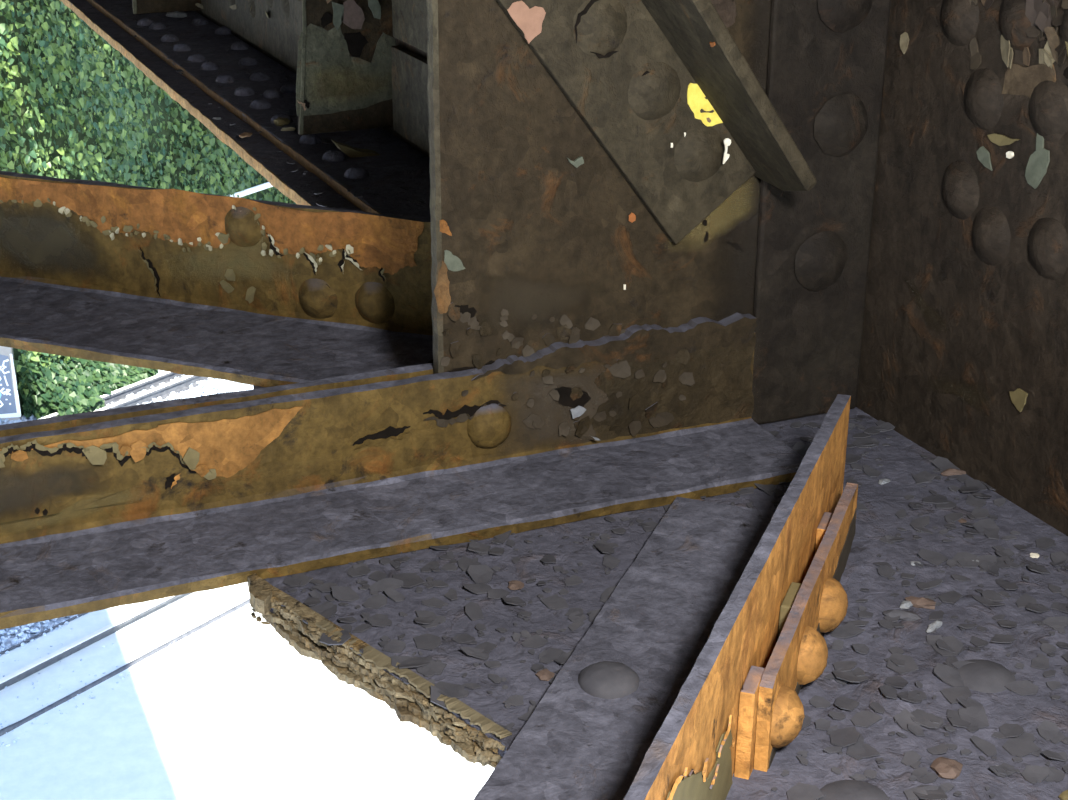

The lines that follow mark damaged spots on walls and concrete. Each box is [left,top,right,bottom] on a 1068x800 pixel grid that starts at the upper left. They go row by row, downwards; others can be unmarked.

peeling [281,0,395,131]
peeling [507,1,546,44]
peeling [1001,0,1068,98]
peeling [976,133,1021,171]
peeling [1025,133,1050,189]
peeling [0,198,230,252]
corrosion [0,177,424,275]
corrosion [440,220,452,236]
crack [137,247,160,296]
corrosion [31,406,303,478]
crack [353,400,506,450]
peeling [666,729,733,800]